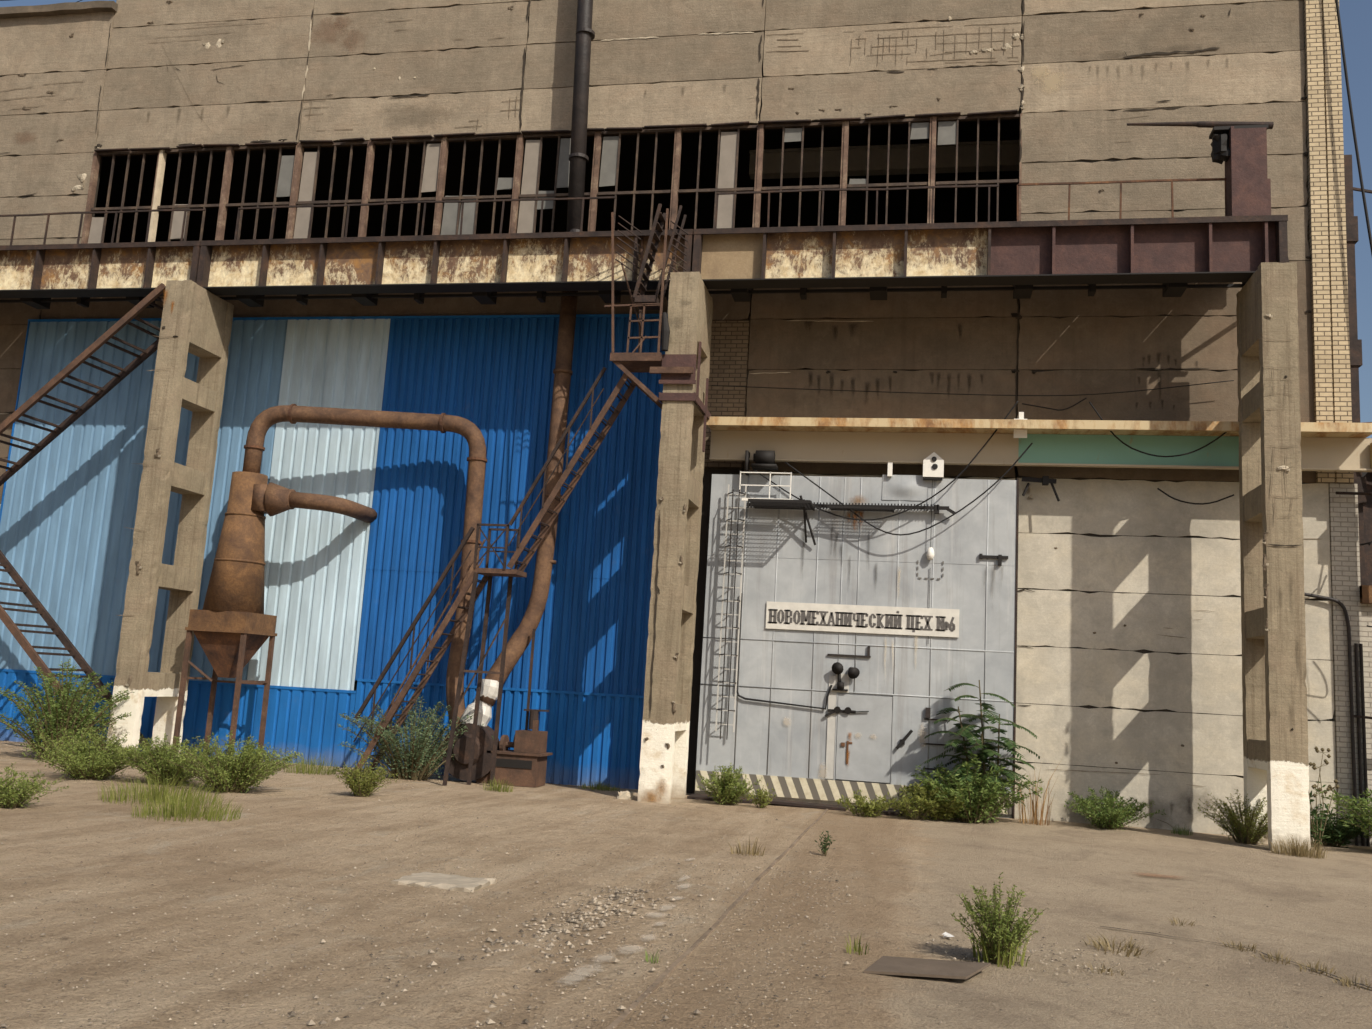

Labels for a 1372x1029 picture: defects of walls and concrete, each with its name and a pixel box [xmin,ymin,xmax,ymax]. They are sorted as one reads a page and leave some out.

crack [457,0,530,128]
crack [296,95,329,140]
crack [390,92,430,100]